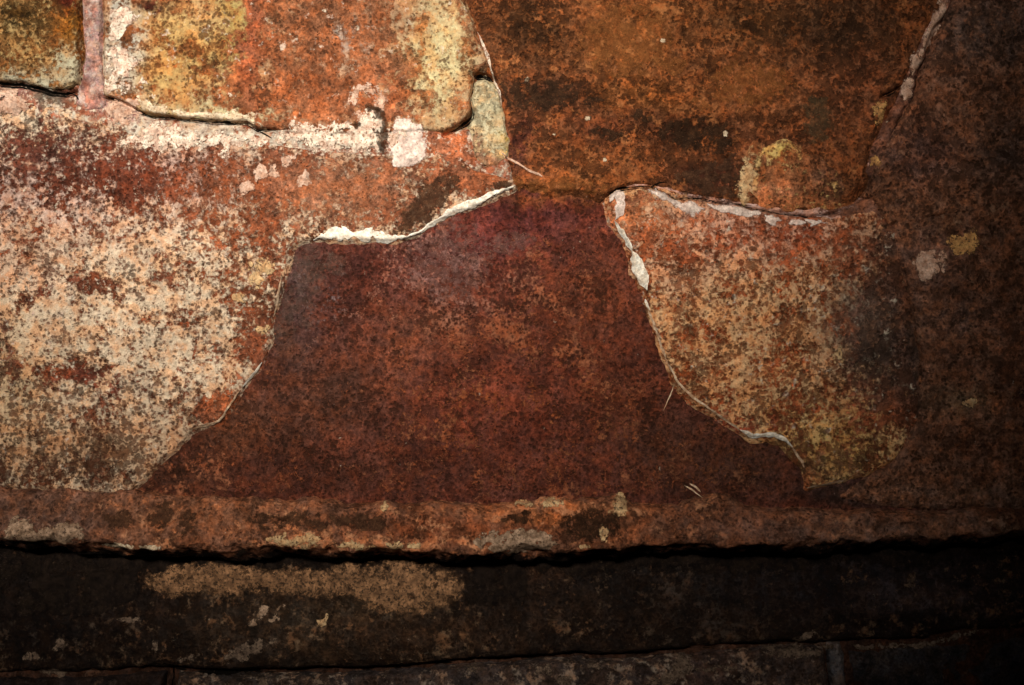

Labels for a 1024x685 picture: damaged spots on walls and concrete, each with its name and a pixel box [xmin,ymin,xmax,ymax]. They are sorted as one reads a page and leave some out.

crack [0,82,79,100]
crack [105,97,271,138]
spalling [138,185,920,511]